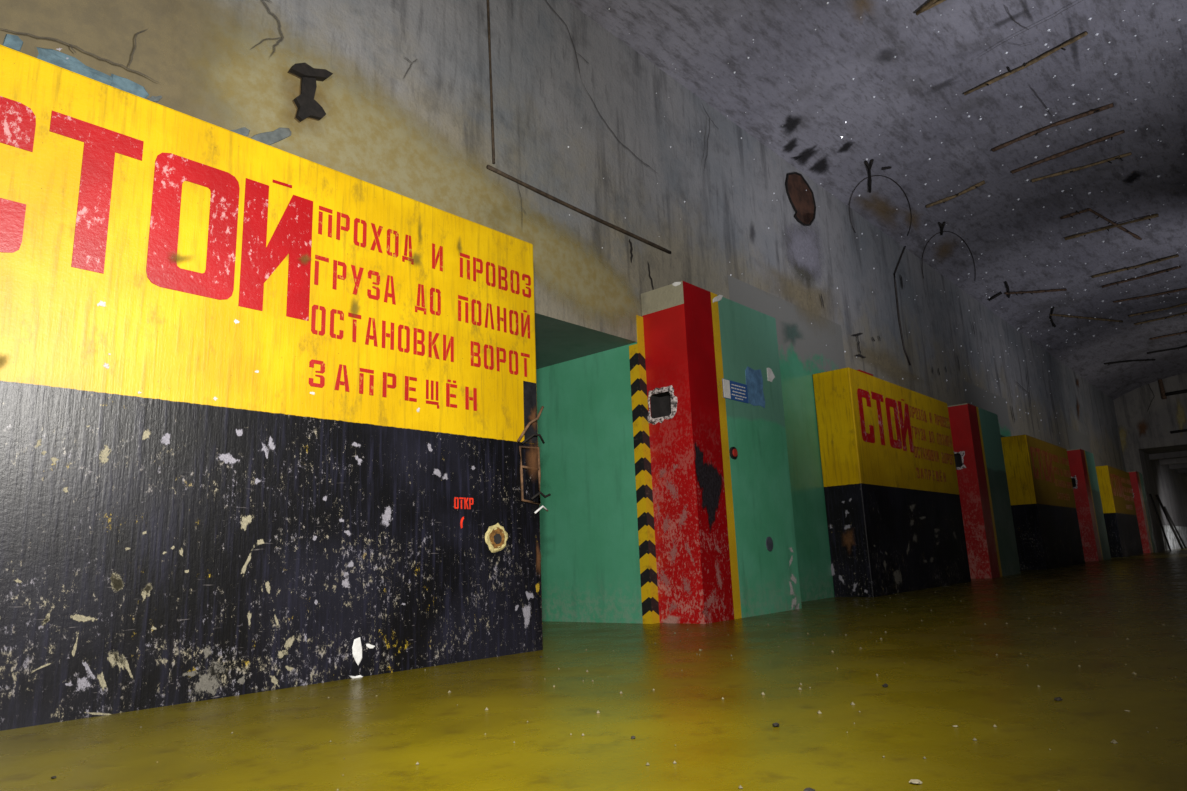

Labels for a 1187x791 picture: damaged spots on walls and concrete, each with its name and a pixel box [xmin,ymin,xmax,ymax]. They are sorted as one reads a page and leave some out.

crack [253,0,284,54]
peeling [99,445,111,464]
peeling [142,430,171,445]
peeling [218,454,240,464]
peeling [380,506,393,526]
peeling [657,464,695,624]
peeling [515,583,539,628]
peeling [703,542,725,620]
peeling [65,614,133,691]
peeling [183,645,226,702]
peeling [271,634,307,687]
peeling [350,637,375,678]